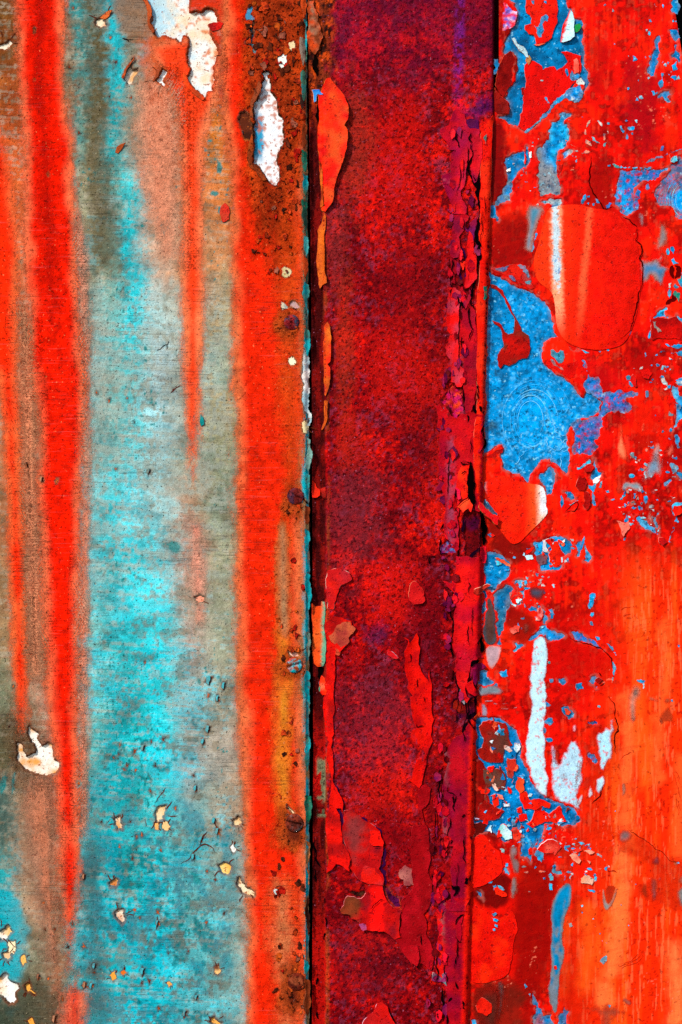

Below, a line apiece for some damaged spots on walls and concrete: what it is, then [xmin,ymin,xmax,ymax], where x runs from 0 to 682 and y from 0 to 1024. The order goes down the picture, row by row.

peeling [143,0,224,101]
peeling [238,0,349,564]
rust [0,0,93,966]
rust [131,0,306,1024]
peeling [270,0,682,1024]
peeling [17,727,59,775]
peeling [136,803,176,838]
peeling [206,841,256,902]
peeling [0,921,49,1003]
rust [57,984,87,1024]